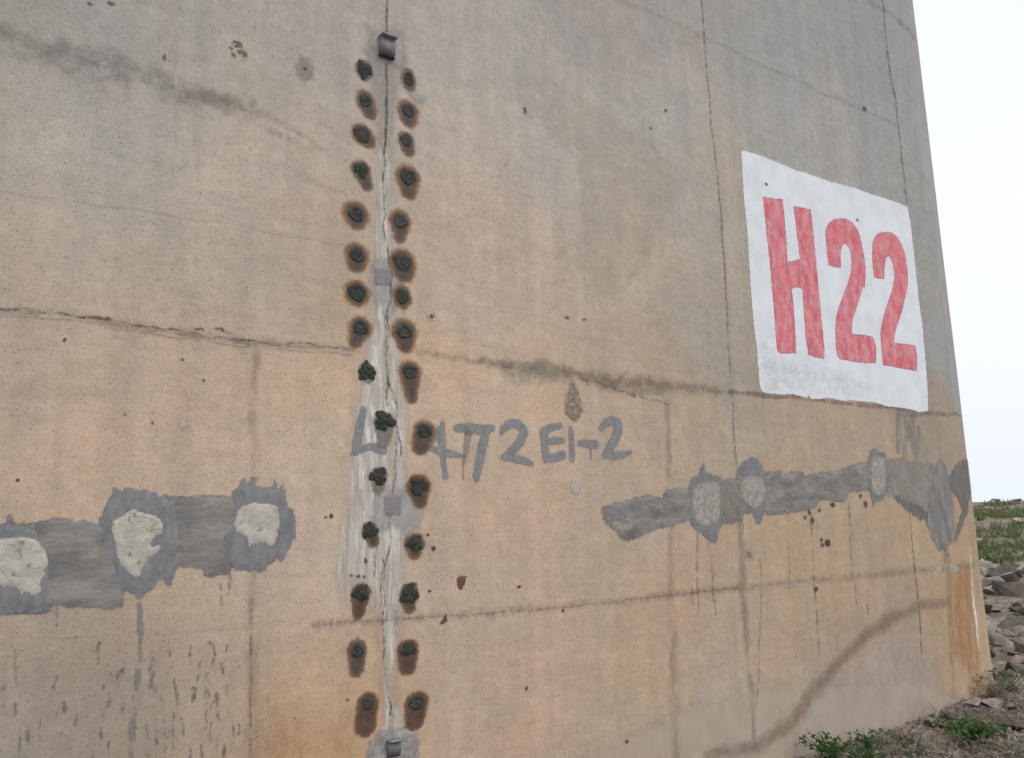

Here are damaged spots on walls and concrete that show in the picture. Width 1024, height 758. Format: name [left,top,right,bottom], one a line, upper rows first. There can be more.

crack [1,308,354,355]
crack [382,61,402,487]
corrosion [388,209,422,402]
crack [503,361,689,398]